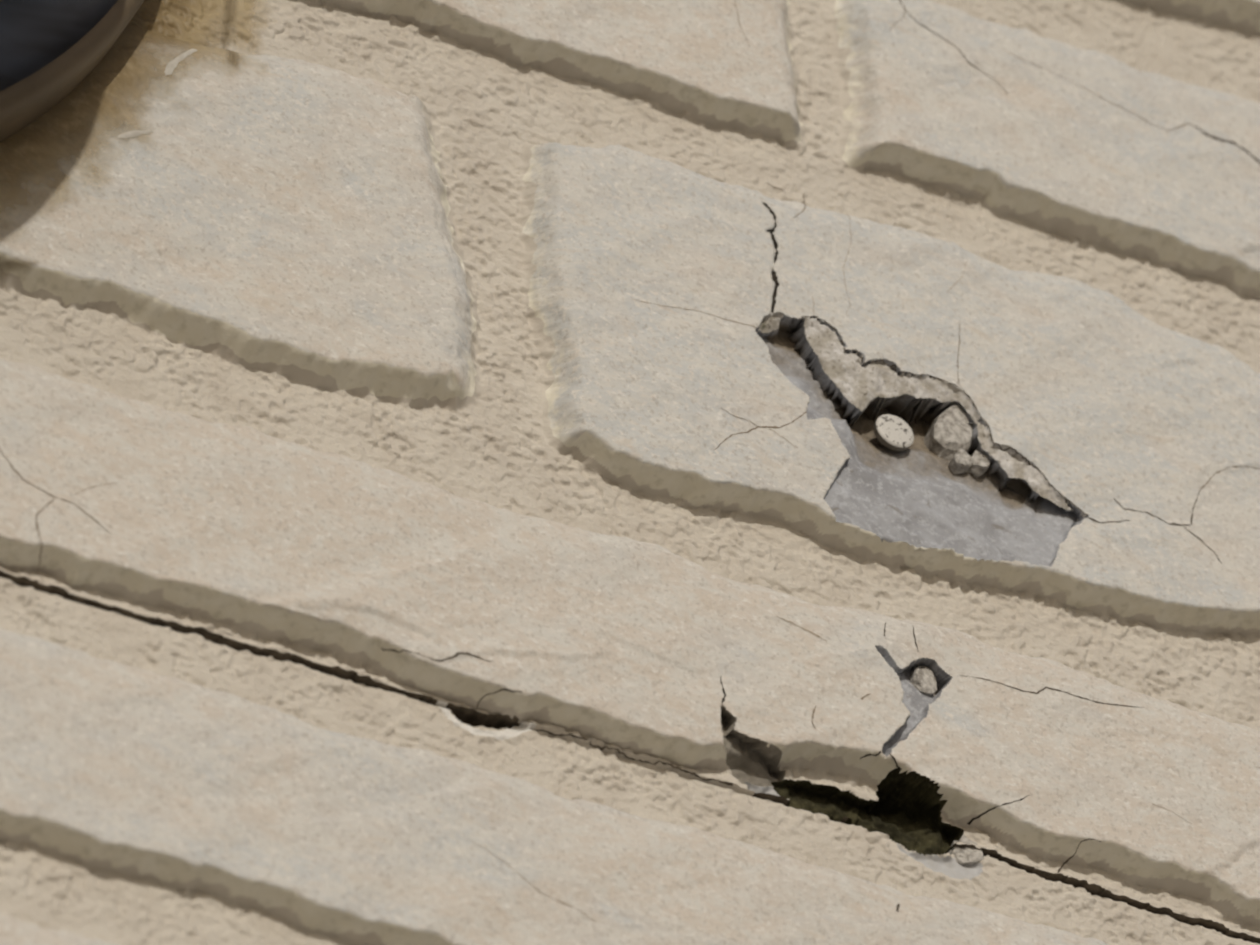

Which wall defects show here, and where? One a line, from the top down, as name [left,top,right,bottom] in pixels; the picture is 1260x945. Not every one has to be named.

crack [889,0,1260,204]
crack [633,183,806,328]
spalling [756,312,1090,567]
crack [0,449,115,584]
crack [1089,465,1260,562]
crack [381,648,489,662]
crack [477,689,522,709]
crack [960,675,1143,708]
spalling [721,645,984,880]
crack [860,750,900,770]
crack [967,795,1029,825]
crack [1055,839,1101,878]